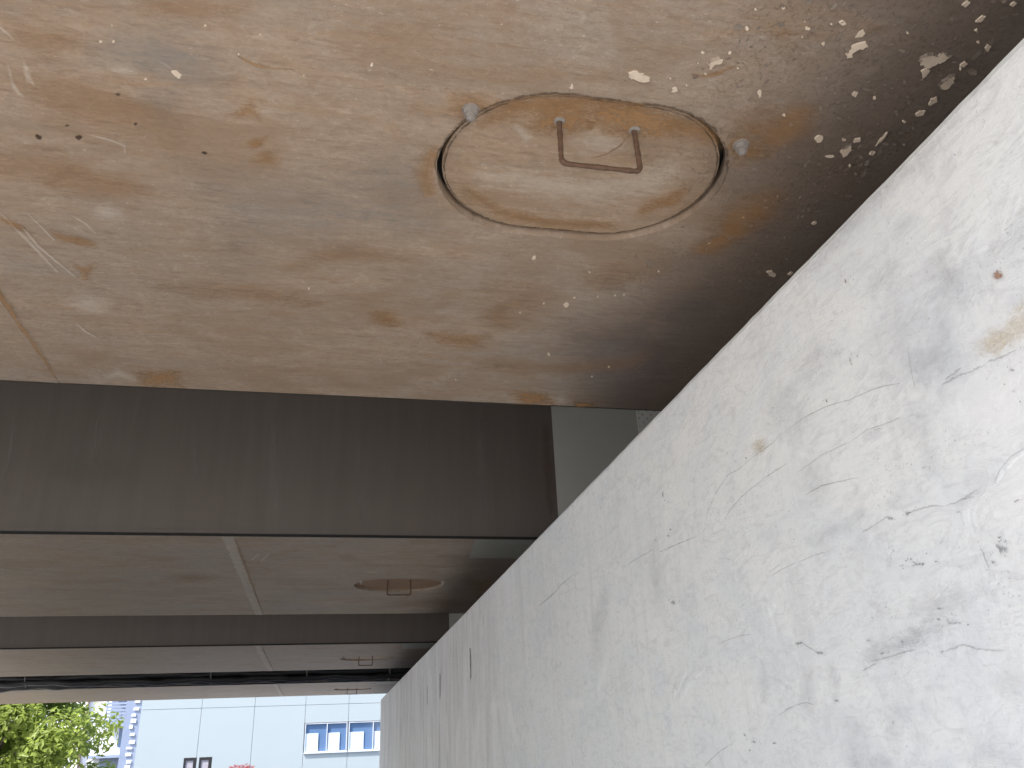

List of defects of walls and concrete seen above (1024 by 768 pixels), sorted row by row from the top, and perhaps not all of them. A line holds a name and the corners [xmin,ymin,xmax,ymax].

peeling [844,29,868,59]
peeling [902,51,968,123]
peeling [840,138,861,167]